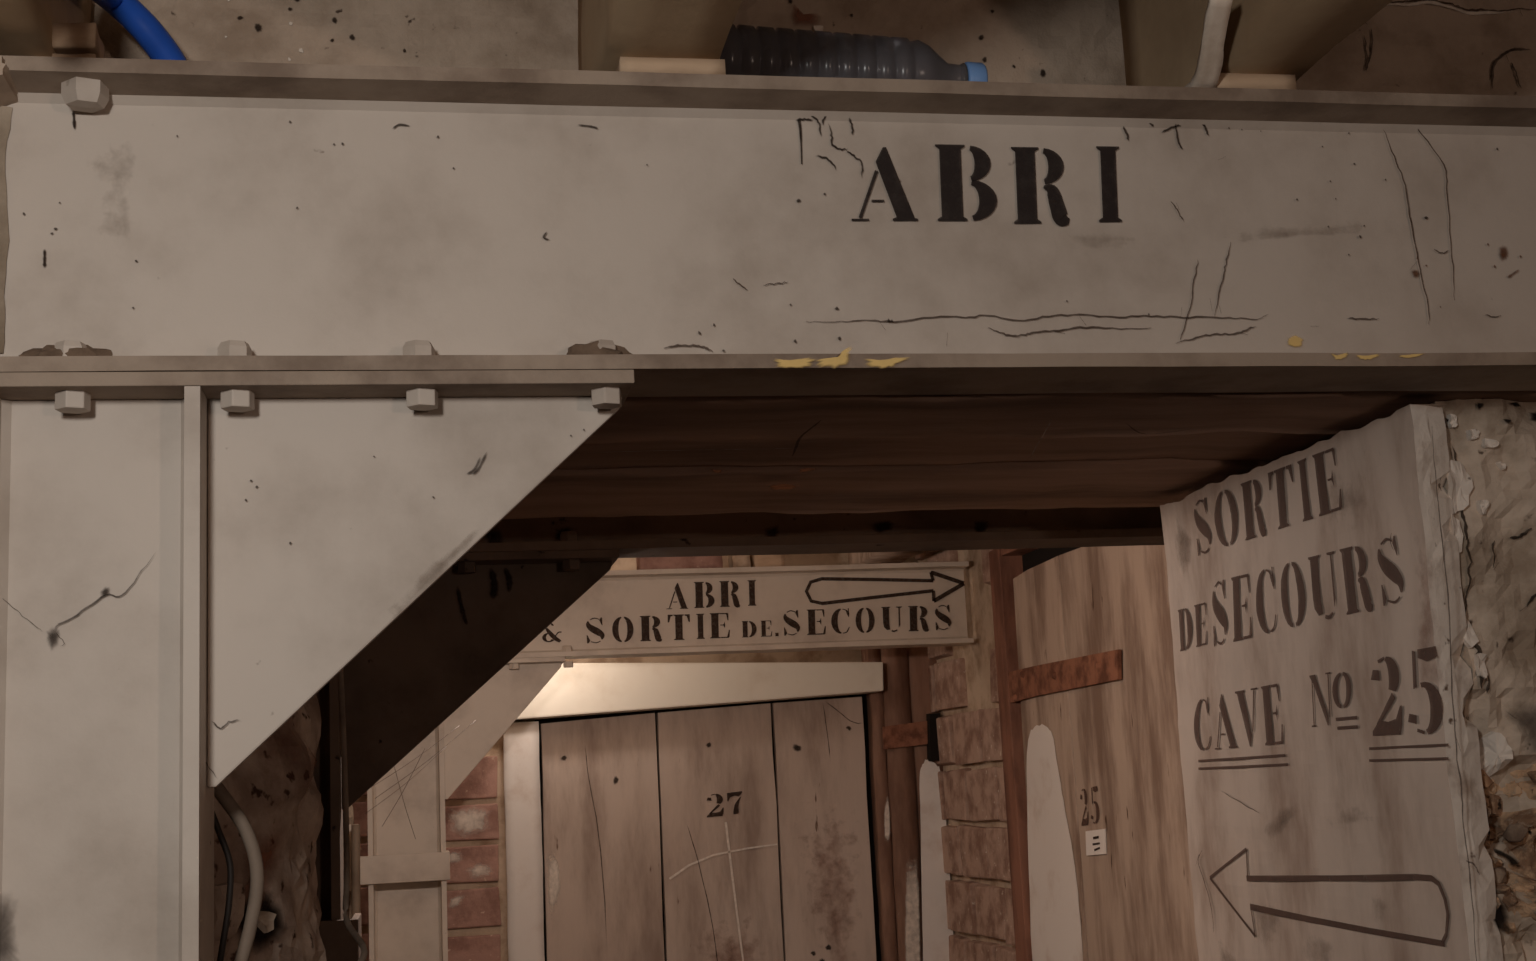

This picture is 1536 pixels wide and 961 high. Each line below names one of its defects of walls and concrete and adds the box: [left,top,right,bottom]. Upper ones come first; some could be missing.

crack [1364,0,1534,88]
crack [1384,129,1499,324]
crack [806,242,1268,346]
flaking render [1445,414,1506,470]
flaking render [1447,460,1489,553]
crack [3,561,150,646]
flaking render [1463,619,1488,679]
spalling [1479,731,1536,934]